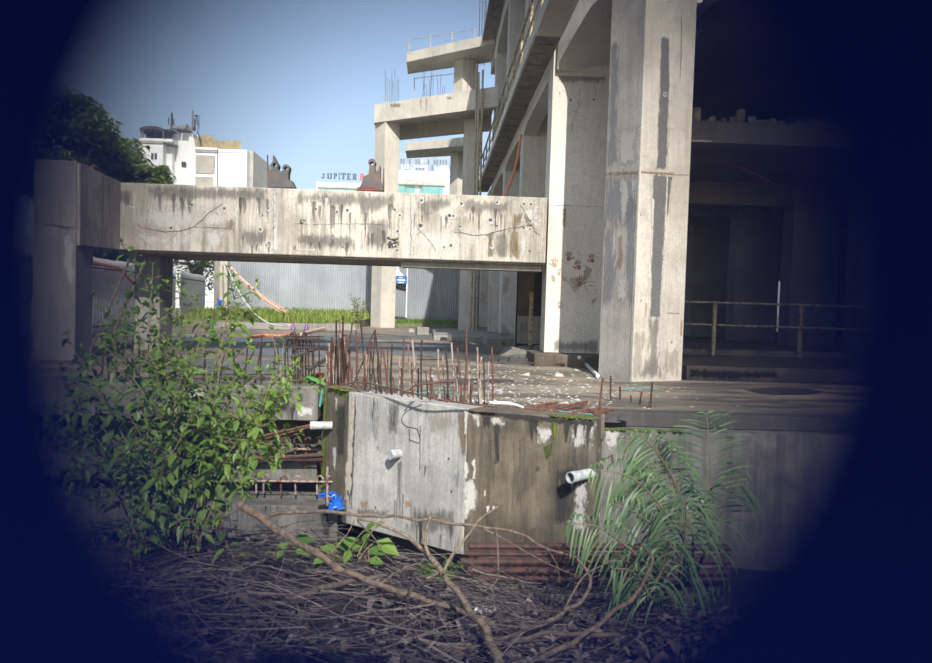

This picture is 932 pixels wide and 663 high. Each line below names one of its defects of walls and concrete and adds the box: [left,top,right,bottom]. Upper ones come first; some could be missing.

flaking render [617,127,640,225]
water stain [395,194,485,256]
water stain [521,205,541,229]
water stain [650,55,672,376]
flaking render [616,274,628,303]
spalling [161,316,505,507]
water stain [458,413,467,454]
water stain [479,411,593,504]
flaking render [510,357,653,447]
flaking render [606,431,619,450]
water stain [555,468,586,529]